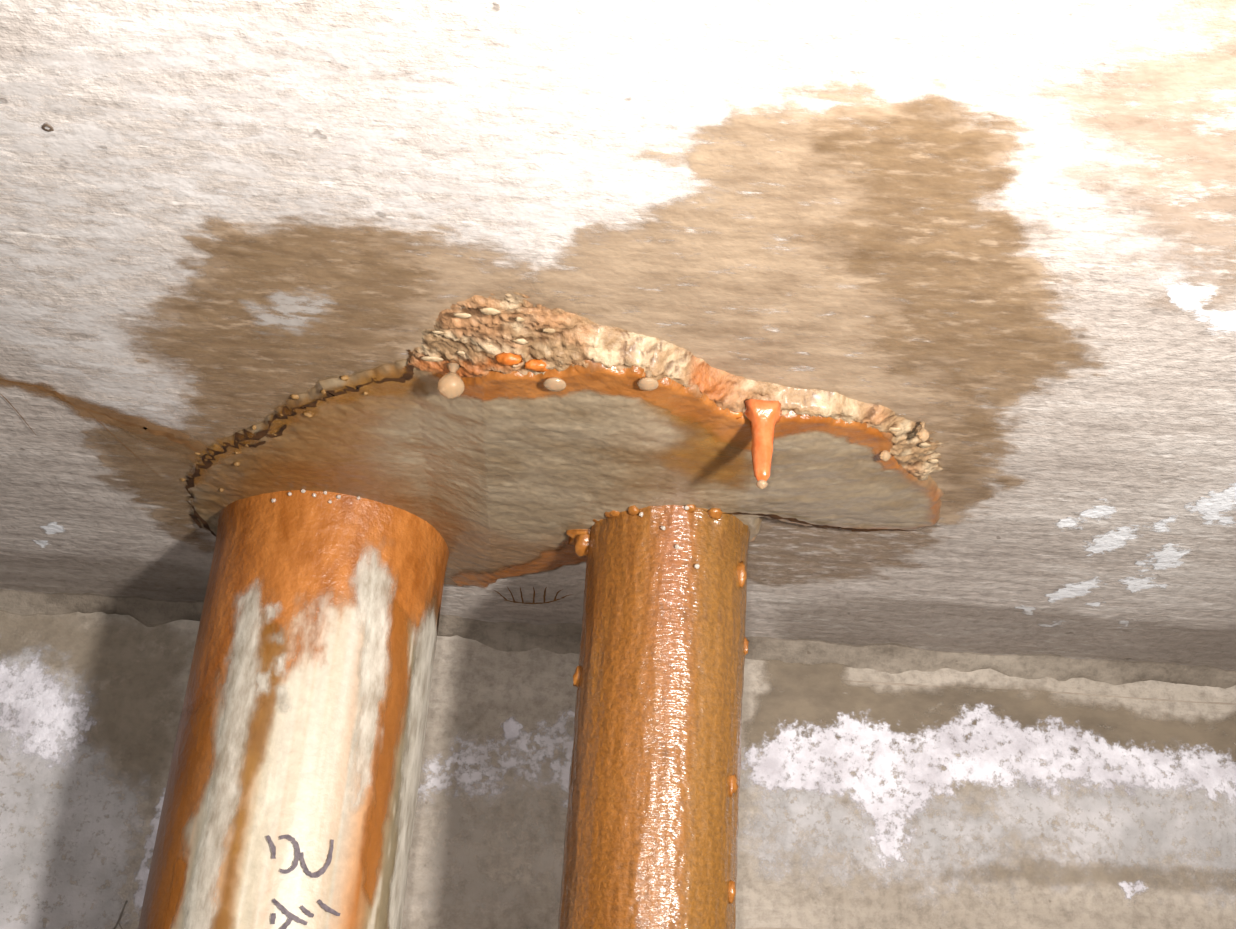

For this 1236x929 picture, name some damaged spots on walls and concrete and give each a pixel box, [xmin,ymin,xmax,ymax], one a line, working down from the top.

crack [0,350,423,537]
water stain [0,23,1107,584]
rust [460,363,752,481]
spalling [403,291,944,481]
rust [684,504,723,520]
rust [774,411,901,469]
efflorescence [0,650,166,929]
water stain [742,660,1236,899]